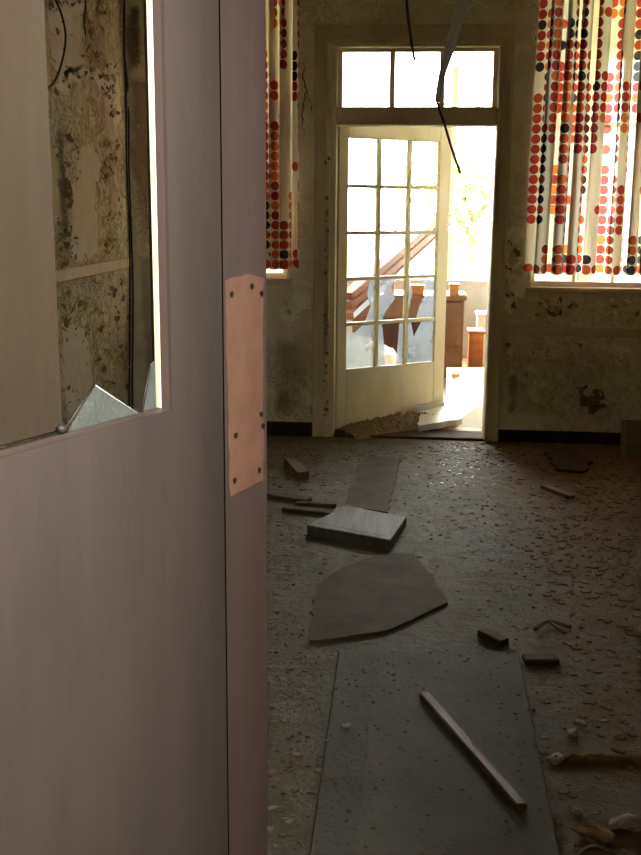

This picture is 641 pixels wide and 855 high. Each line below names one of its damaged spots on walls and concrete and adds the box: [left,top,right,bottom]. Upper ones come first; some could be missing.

peeling [47,0,126,268]
peeling [504,248,530,315]
peeling [577,385,608,415]